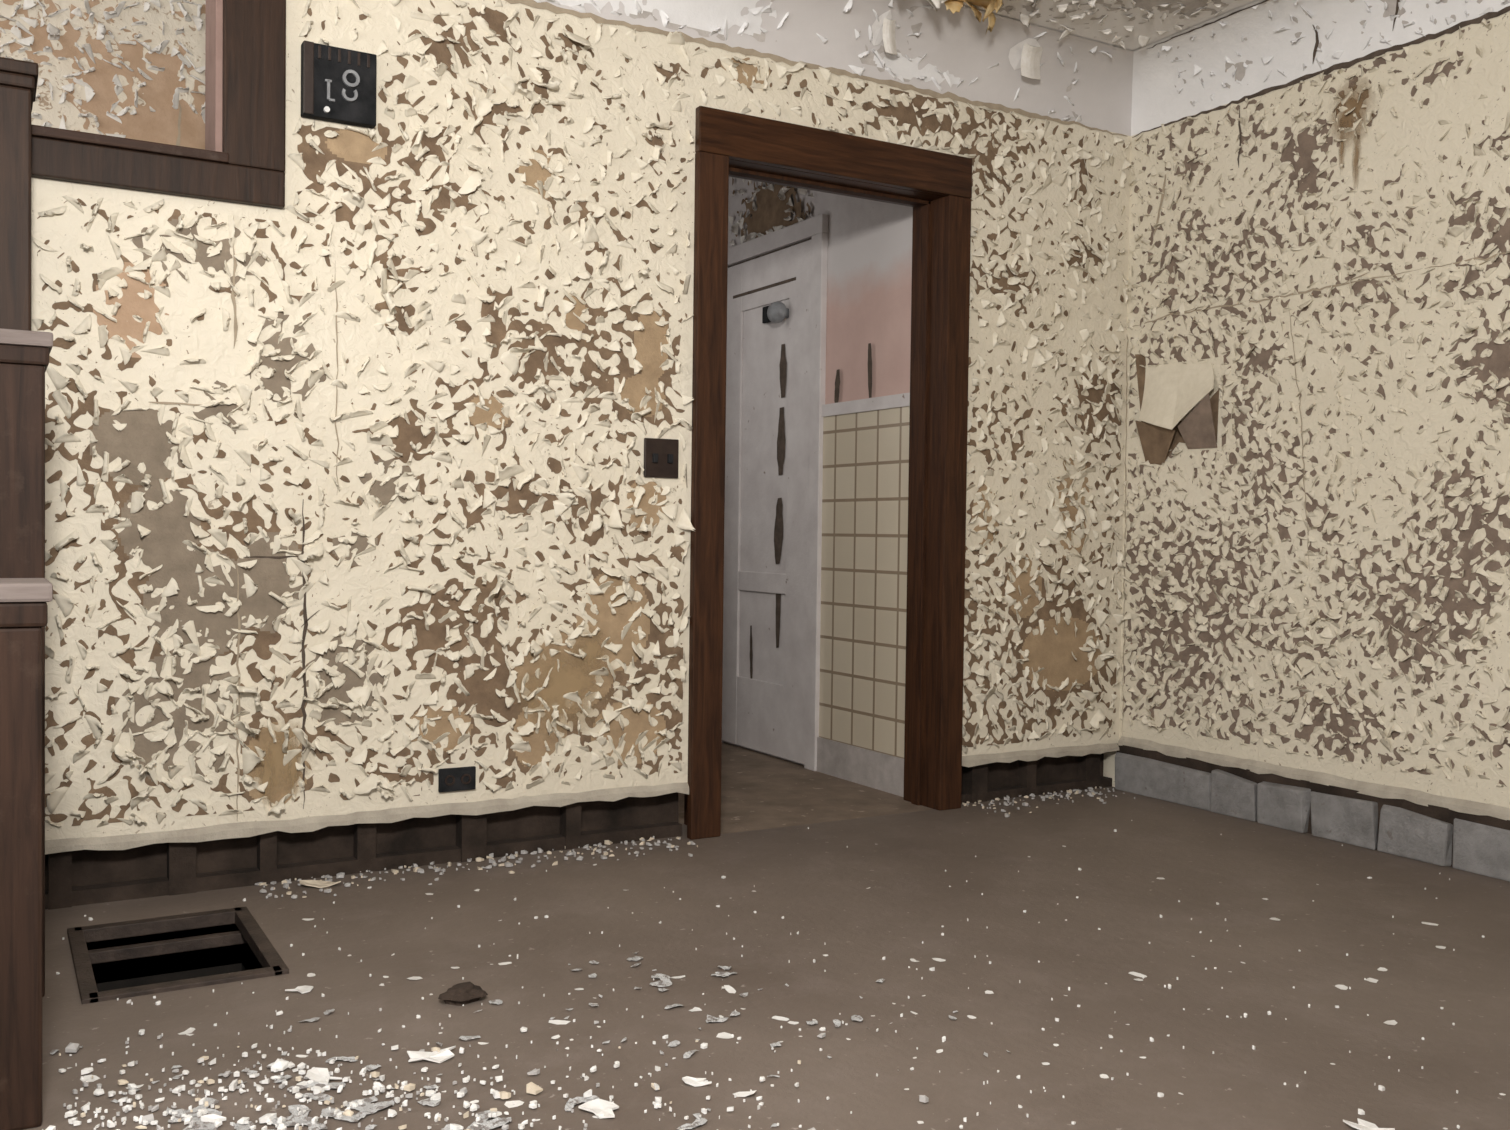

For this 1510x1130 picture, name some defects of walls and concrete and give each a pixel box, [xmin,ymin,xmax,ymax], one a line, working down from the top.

peeling [0,0,206,150]
peeling [31,0,1510,827]